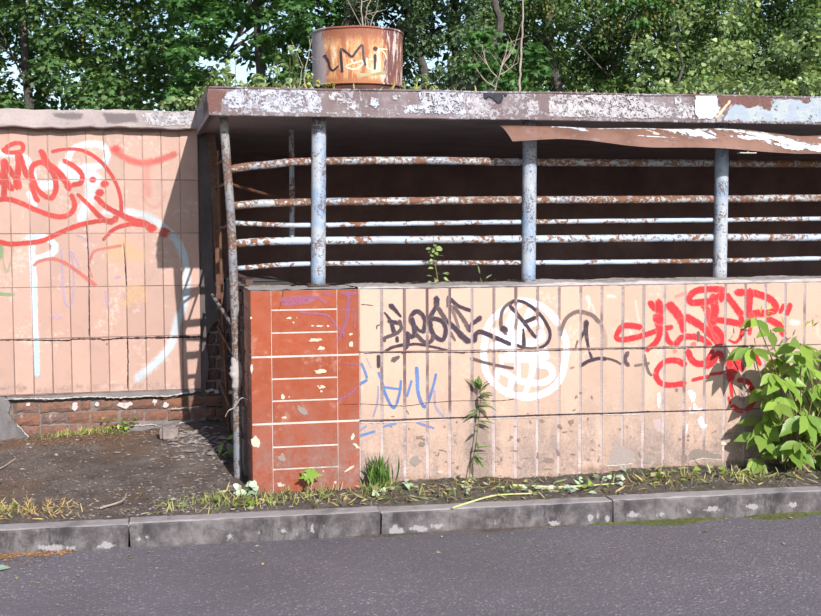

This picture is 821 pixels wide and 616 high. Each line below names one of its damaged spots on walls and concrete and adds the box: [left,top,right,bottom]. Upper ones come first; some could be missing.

peeling [222,89,379,114]
peeling [397,89,489,115]
peeling [525,101,539,116]
peeling [549,93,821,123]
crack [6,225,201,389]
spalling [5,271,253,437]